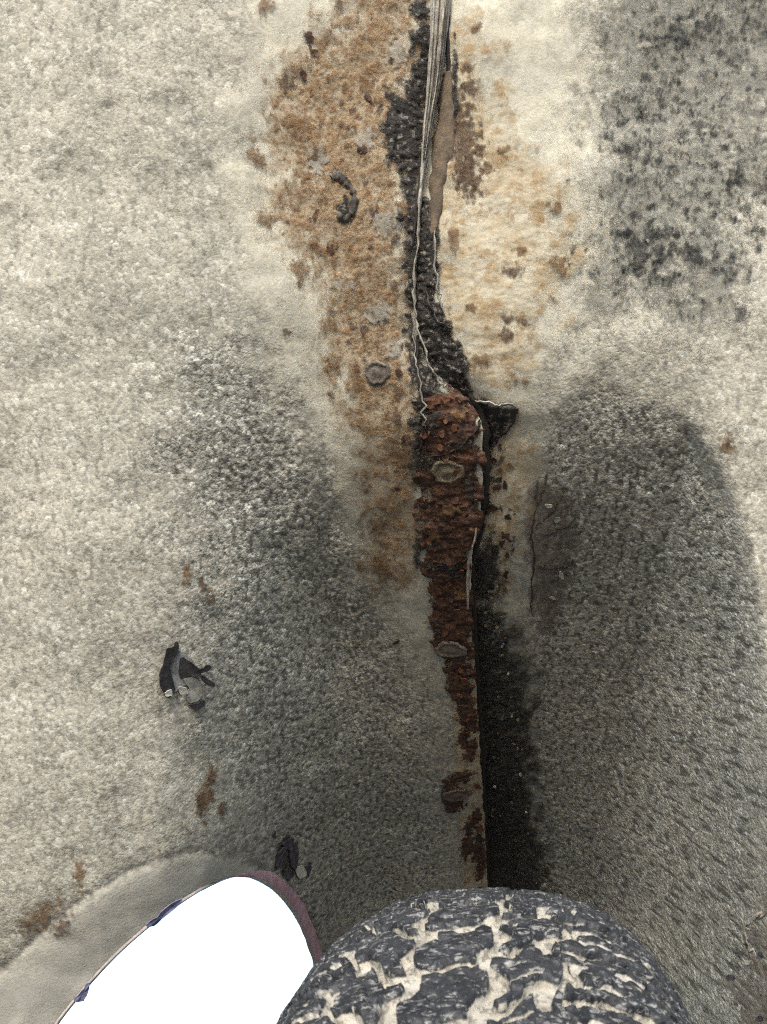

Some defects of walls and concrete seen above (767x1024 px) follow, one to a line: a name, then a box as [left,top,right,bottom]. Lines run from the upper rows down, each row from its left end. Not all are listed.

crack [412,162,421,245]
crack [444,15,452,71]
rust [437,9,585,388]
peeling [159,641,216,709]
rust [246,0,543,889]
crack [414,335,491,887]
water stain [471,469,562,894]